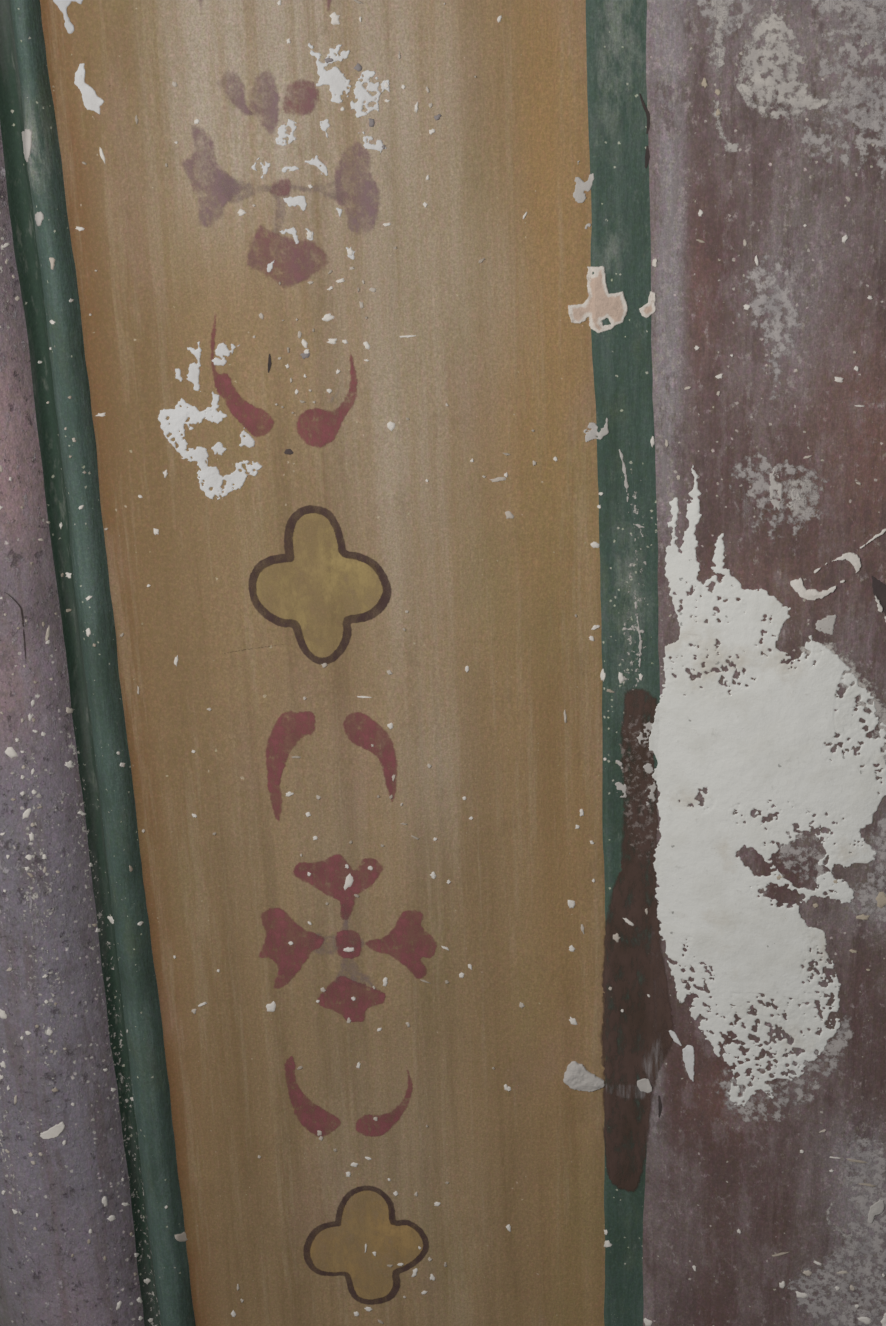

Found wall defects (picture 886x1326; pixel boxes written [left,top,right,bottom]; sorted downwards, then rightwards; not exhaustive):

peeling [53,0,83,34]
peeling [276,119,297,146]
peeling [251,155,328,211]
peeling [308,43,406,153]
peeling [279,227,314,244]
flaking render [568,266,656,333]
peeling [275,313,334,414]
peeling [158,335,262,500]
flaking render [584,418,609,442]
peeling [600,449,886,1192]
peeling [5,700,67,1092]
peeling [0,1047,66,1272]